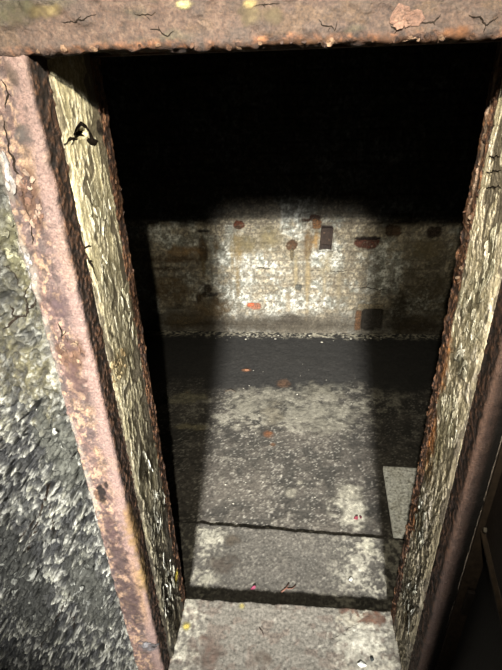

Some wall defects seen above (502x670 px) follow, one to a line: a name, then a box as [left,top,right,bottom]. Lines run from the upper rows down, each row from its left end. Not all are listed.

crack [135,12,174,37]
corrosion [318,37,357,49]
corrosion [389,3,448,43]
crack [469,15,497,32]
crack [1,79,34,244]
corrosion [16,169,44,229]
corrosion [56,335,87,393]
corrosion [103,513,151,625]